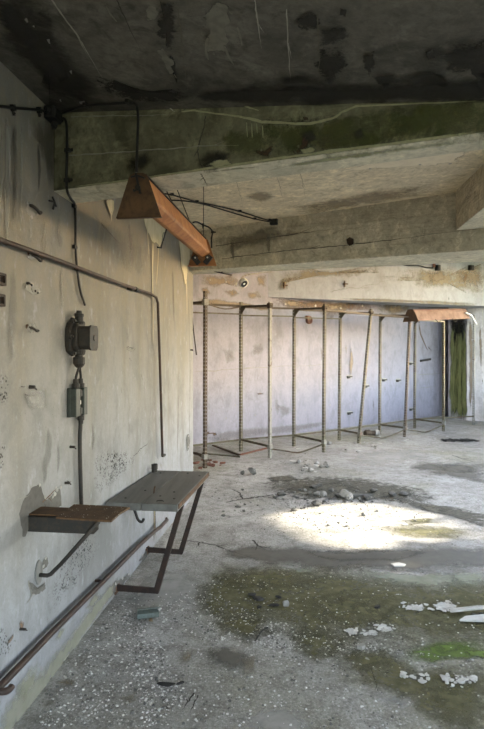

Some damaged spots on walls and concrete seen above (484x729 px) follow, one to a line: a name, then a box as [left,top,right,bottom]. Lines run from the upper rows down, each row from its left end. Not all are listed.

damp [181,12,484,141]
damp [200,152,227,170]
damp [414,463,484,482]
crack [226,486,305,503]
flaking render [19,483,62,537]
damp [227,547,484,585]
peeling [29,582,45,594]
damp [208,647,254,672]
damp [248,711,300,729]